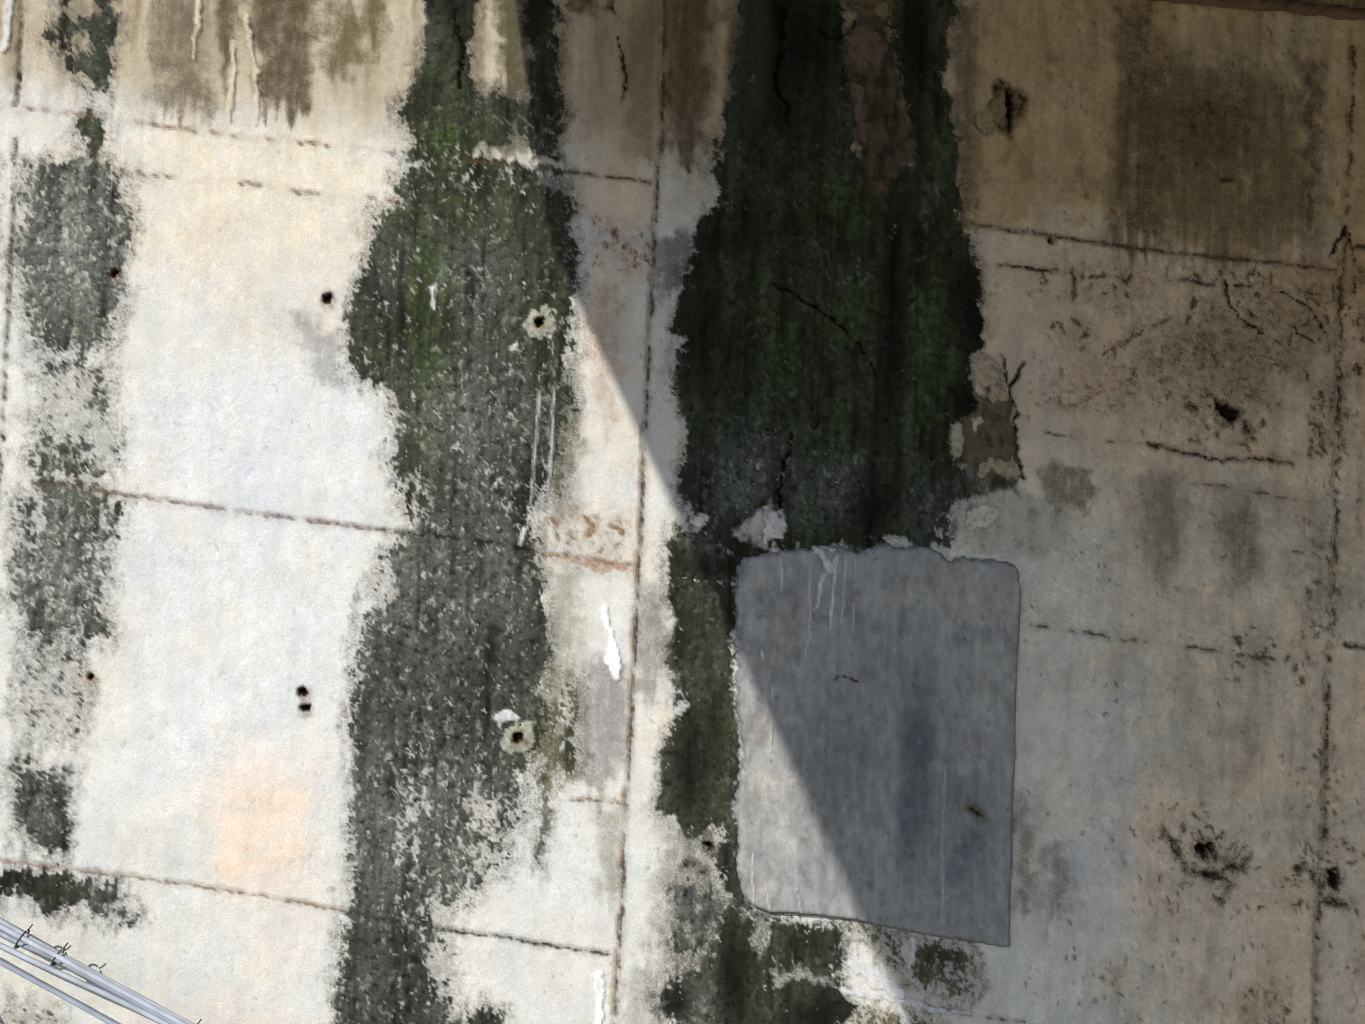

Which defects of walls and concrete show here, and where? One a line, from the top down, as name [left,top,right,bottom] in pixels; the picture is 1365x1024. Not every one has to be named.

water stain [41,0,127,160]
water stain [218,0,310,126]
water stain [400,0,592,158]
water stain [628,0,857,173]
water stain [883,0,977,226]
crack [1330,226,1355,261]
crack [1224,280,1325,342]
peeling [949,352,1022,483]
water stain [7,644,92,856]
water stain [494,710,519,721]
spalling [1152,803,1261,905]
water stain [841,958,970,1024]